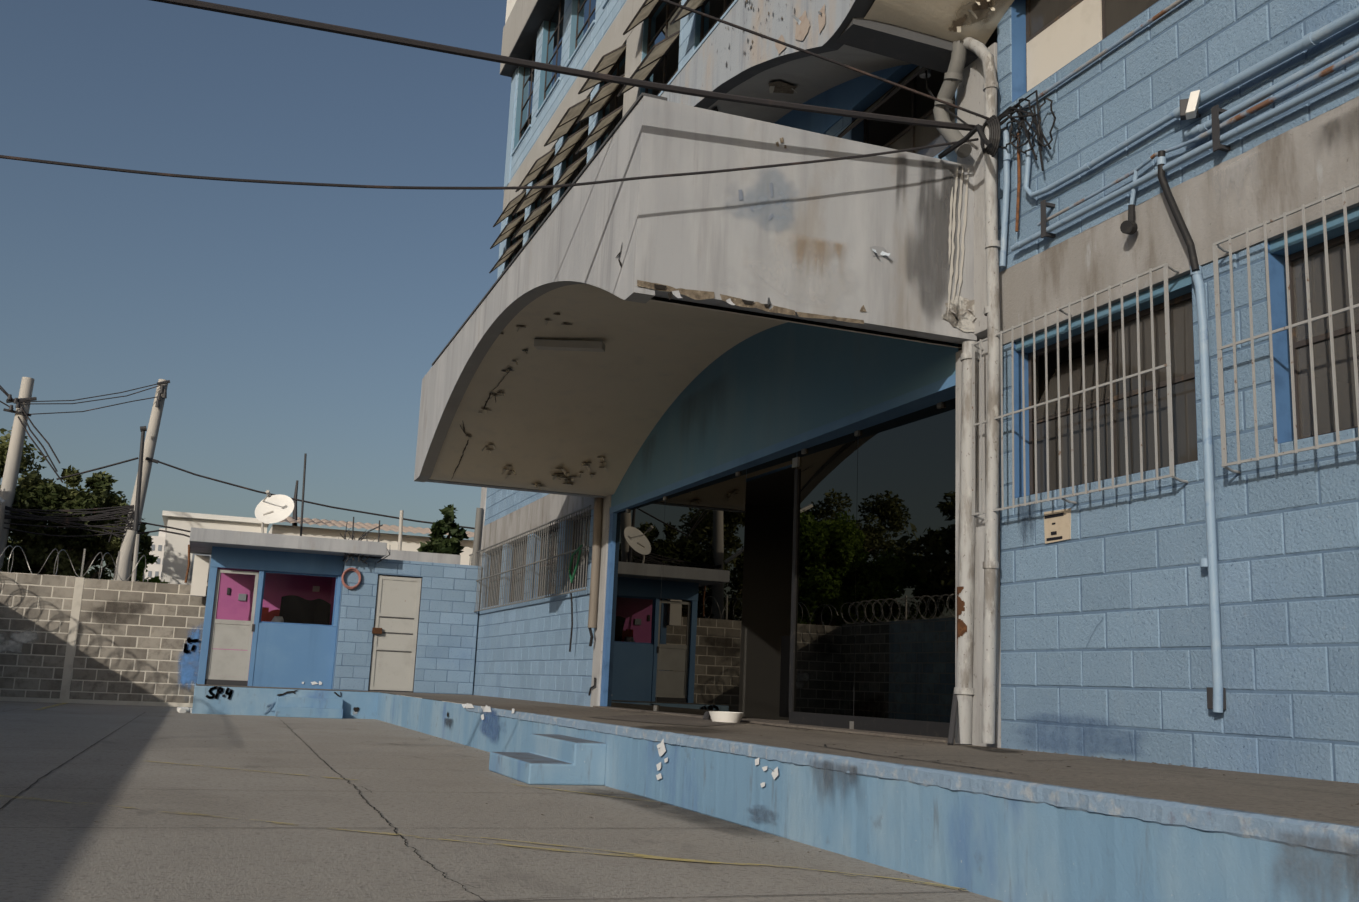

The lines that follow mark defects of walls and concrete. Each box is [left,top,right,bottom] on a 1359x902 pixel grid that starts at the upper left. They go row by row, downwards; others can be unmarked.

peeling [725,0,825,67]
peeling [949,0,995,32]
damp [897,156,906,191]
damp [908,163,969,317]
peeling [462,703,491,720]
peeling [656,739,668,780]
peeling [755,758,778,788]
crack [264,690,584,902]